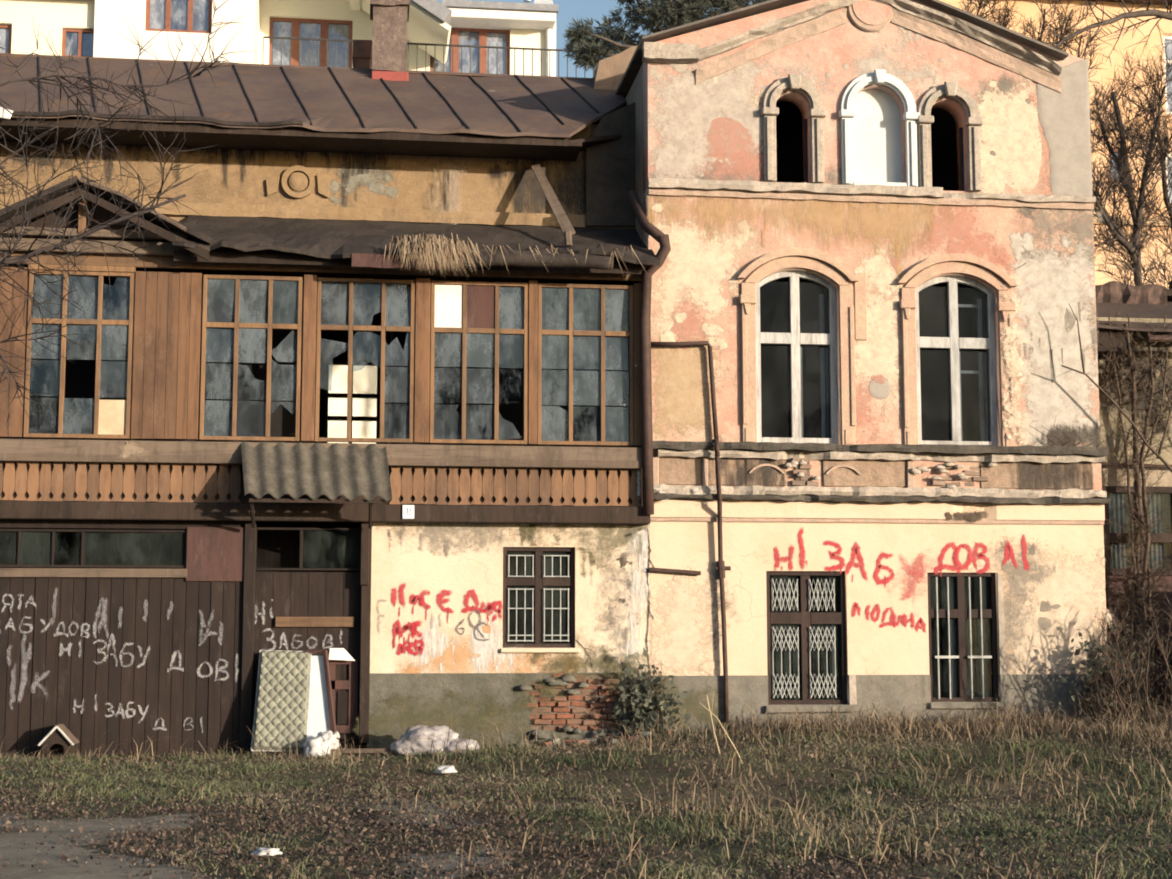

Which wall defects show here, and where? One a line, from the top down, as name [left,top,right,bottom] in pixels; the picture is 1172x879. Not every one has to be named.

damp [0,163,64,197]
damp [89,145,247,203]
damp [434,164,463,225]
peeling [648,26,943,181]
peeling [961,75,1053,209]
peeling [648,196,761,350]
peeling [853,205,1100,447]
peeling [642,558,719,684]
spalling [515,668,648,744]